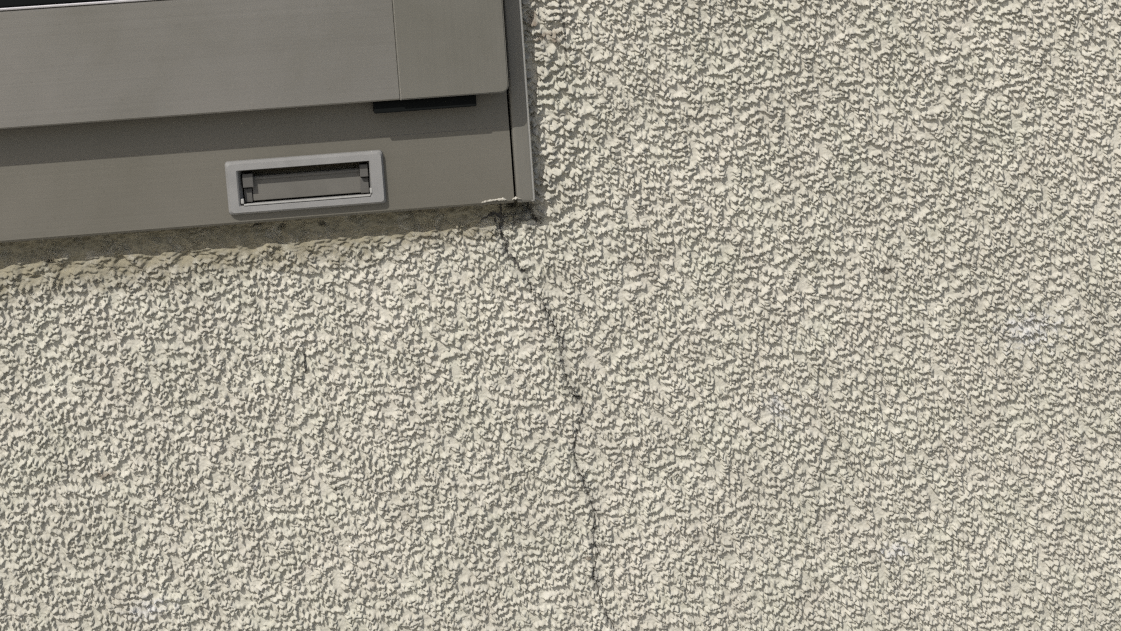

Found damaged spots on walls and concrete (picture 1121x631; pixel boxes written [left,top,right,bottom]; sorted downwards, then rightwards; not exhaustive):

crack [481,202,614,629]